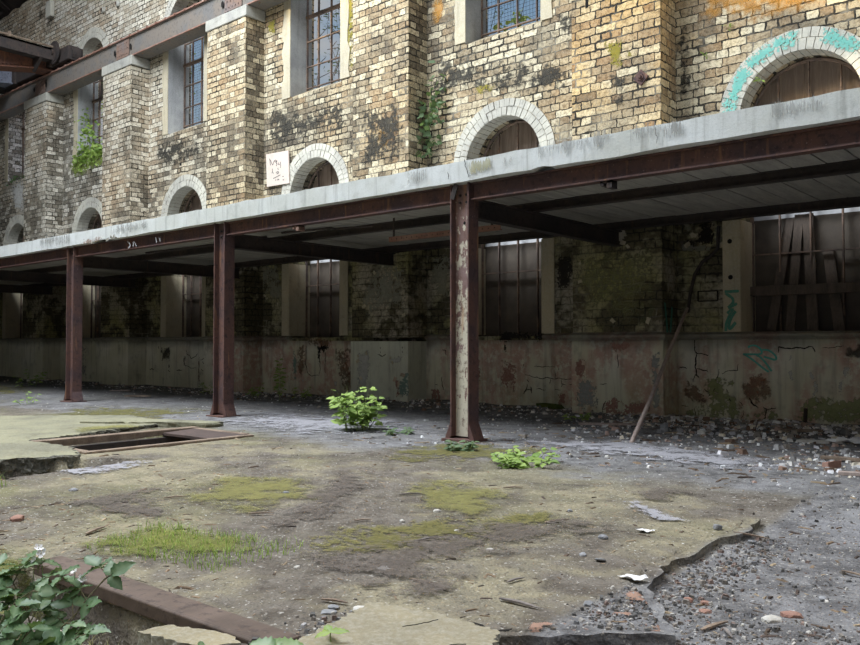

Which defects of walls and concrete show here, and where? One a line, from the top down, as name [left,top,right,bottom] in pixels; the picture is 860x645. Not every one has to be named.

leakage [270,103,346,143]
leakage [361,104,404,164]
crack [679,340,776,419]
leakage [798,345,860,423]